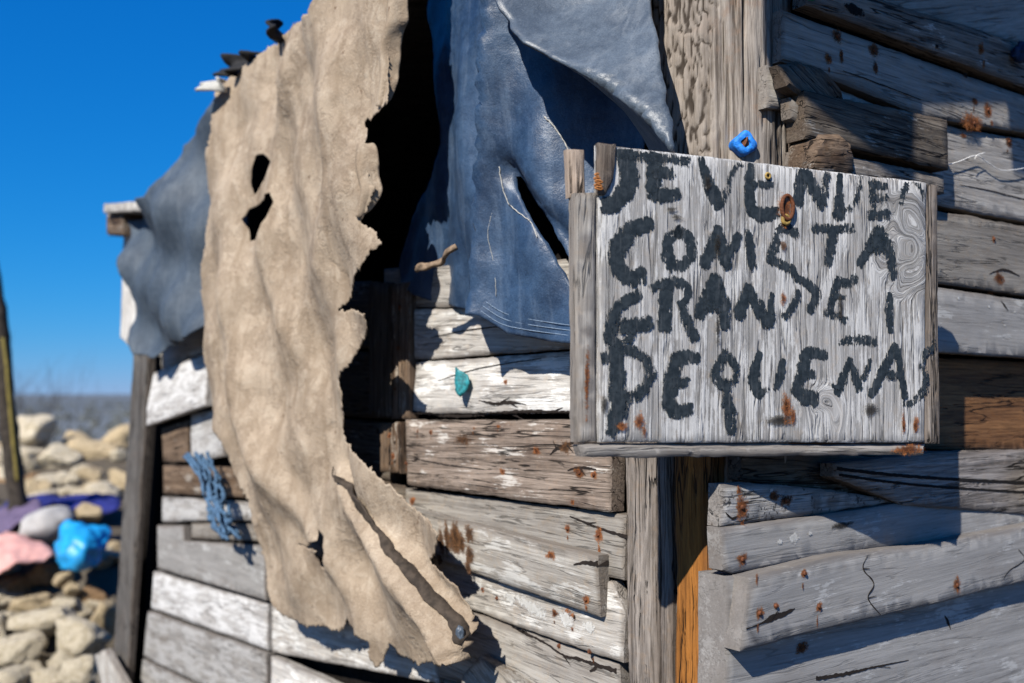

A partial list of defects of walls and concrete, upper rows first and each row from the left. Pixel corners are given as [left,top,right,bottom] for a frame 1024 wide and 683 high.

rust [961,98,993,138]
rust [736,486,748,526]
crack [863,556,881,615]